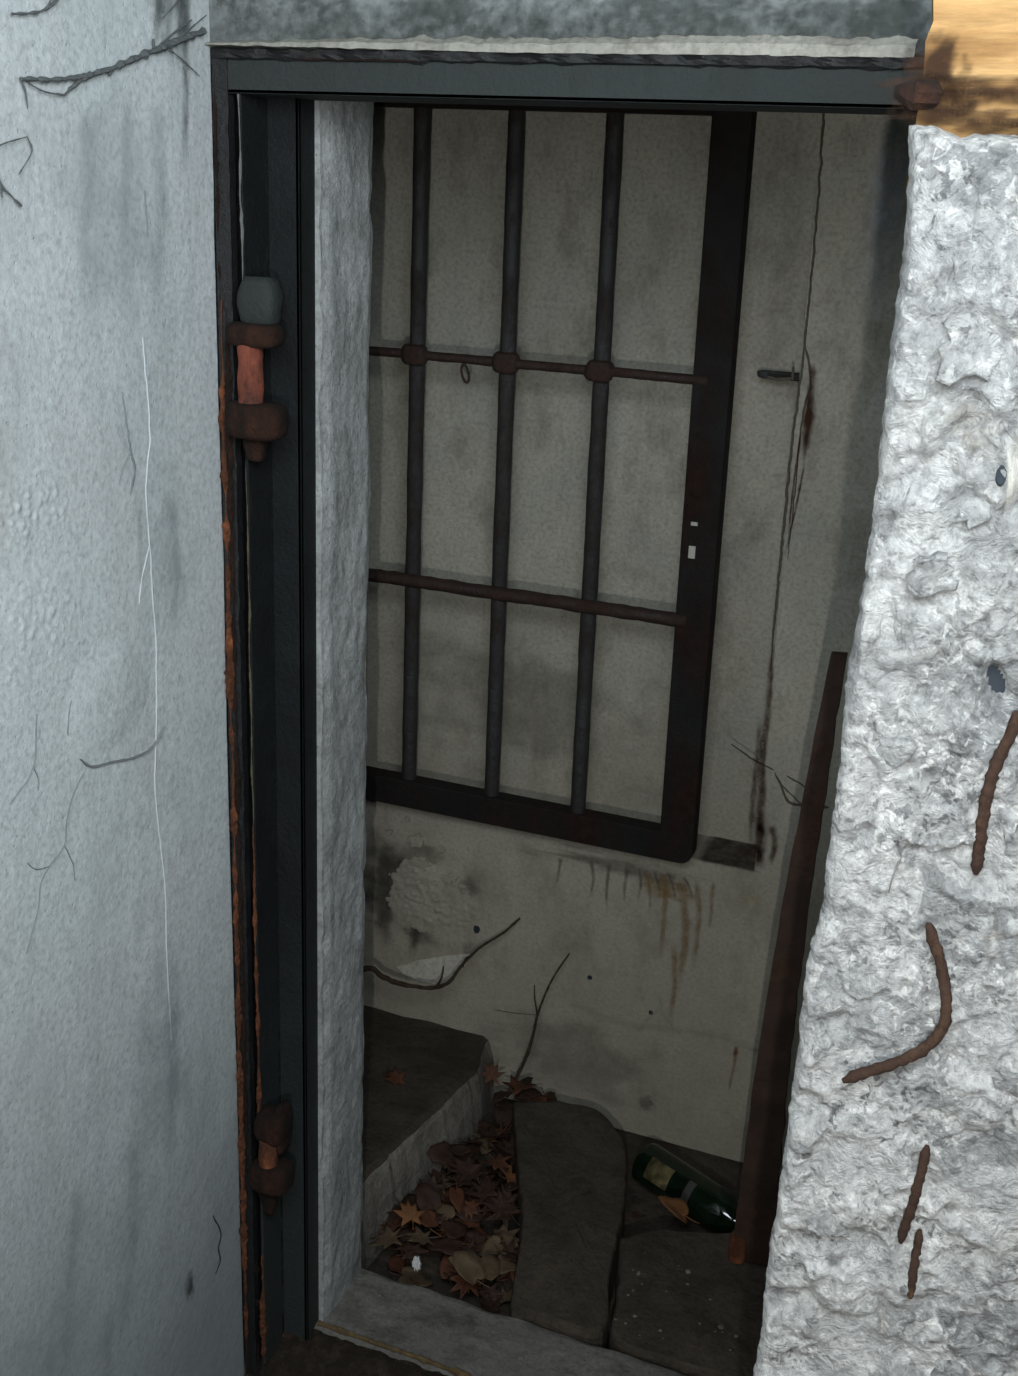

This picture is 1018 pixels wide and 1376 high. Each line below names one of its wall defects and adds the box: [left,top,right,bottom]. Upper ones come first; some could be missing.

spalling [753,125,1018,1376]